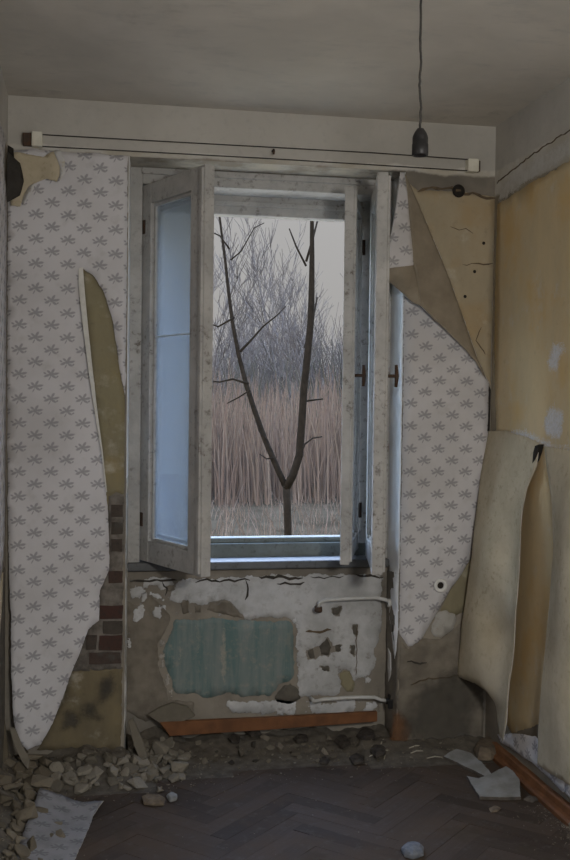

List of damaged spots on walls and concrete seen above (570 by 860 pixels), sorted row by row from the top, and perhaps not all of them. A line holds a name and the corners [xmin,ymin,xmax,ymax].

peeling [392,172,406,225]
crack [417,130,570,200]
peeling [37,269,484,751]
peeling [410,161,570,733]